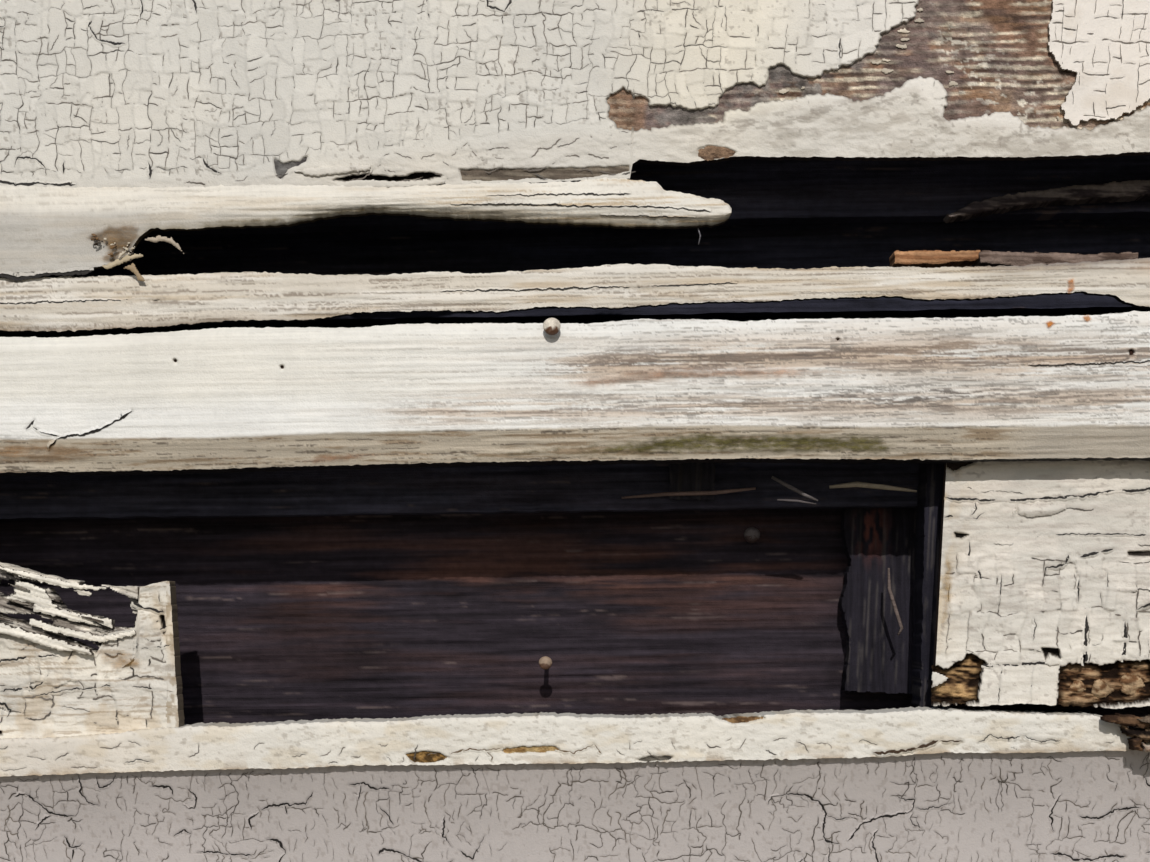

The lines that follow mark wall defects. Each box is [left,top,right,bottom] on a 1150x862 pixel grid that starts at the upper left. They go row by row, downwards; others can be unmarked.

crack [0,0,914,218]
peeling [698,146,736,161]
peeling [607,0,1150,131]
crack [26,409,132,451]
crack [944,477,1150,703]
peeling [931,672,947,688]